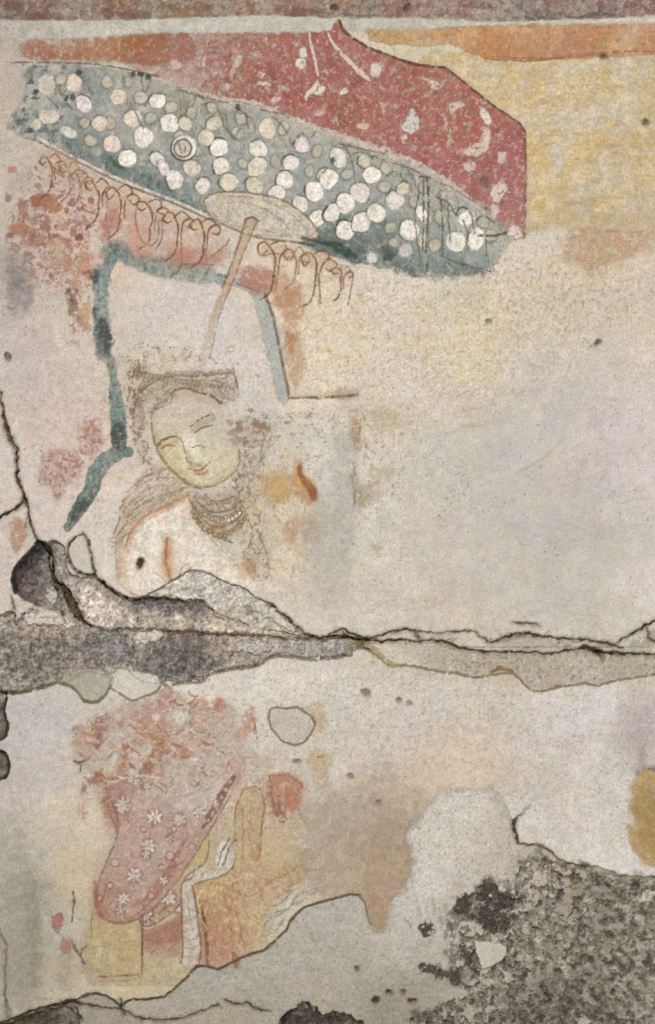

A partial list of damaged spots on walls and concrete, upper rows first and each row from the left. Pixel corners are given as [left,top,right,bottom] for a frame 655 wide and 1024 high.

crack [0,392,185,627]
flaking render [0,535,368,781]
flaking render [440,640,655,690]
flaking render [0,788,655,1024]